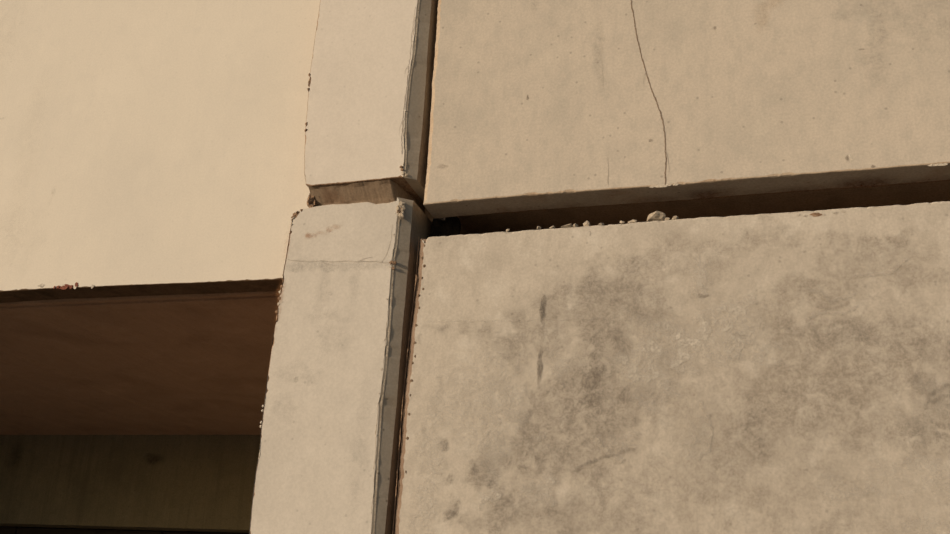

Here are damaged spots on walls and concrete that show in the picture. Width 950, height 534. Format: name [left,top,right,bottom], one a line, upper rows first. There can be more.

crack [631,0,669,185]